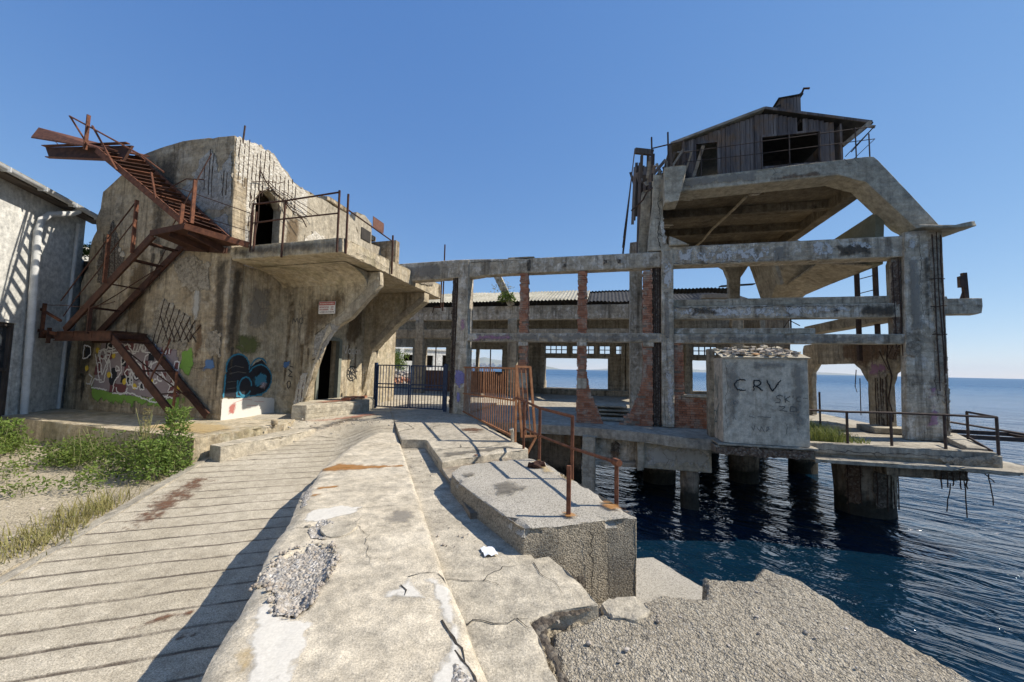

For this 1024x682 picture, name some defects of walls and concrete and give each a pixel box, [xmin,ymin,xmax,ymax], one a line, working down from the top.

spalling [181,125,328,245]
spalling [935,455,1000,518]
spalling [248,519,341,618]
crack [408,562,560,589]